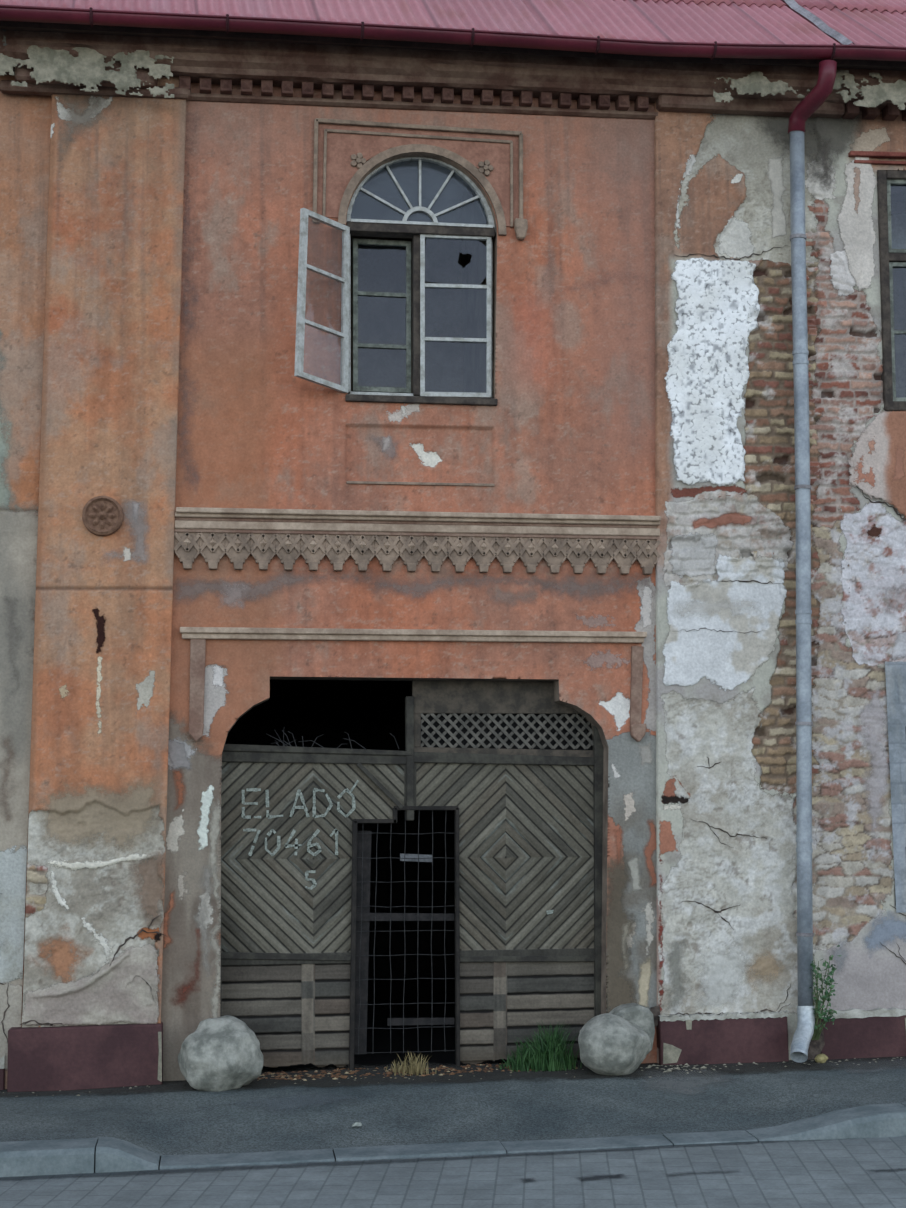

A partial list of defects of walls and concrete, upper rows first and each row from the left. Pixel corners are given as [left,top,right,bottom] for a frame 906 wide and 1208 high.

peeling [0,29,174,141]
peeling [387,403,420,424]
peeling [375,437,443,468]
spalling [582,70,906,1030]
rust [92,608,106,733]
peeling [203,664,229,738]
crack [691,819,767,848]
spalling [22,785,216,1027]
crack [110,915,167,965]
crack [681,901,740,929]